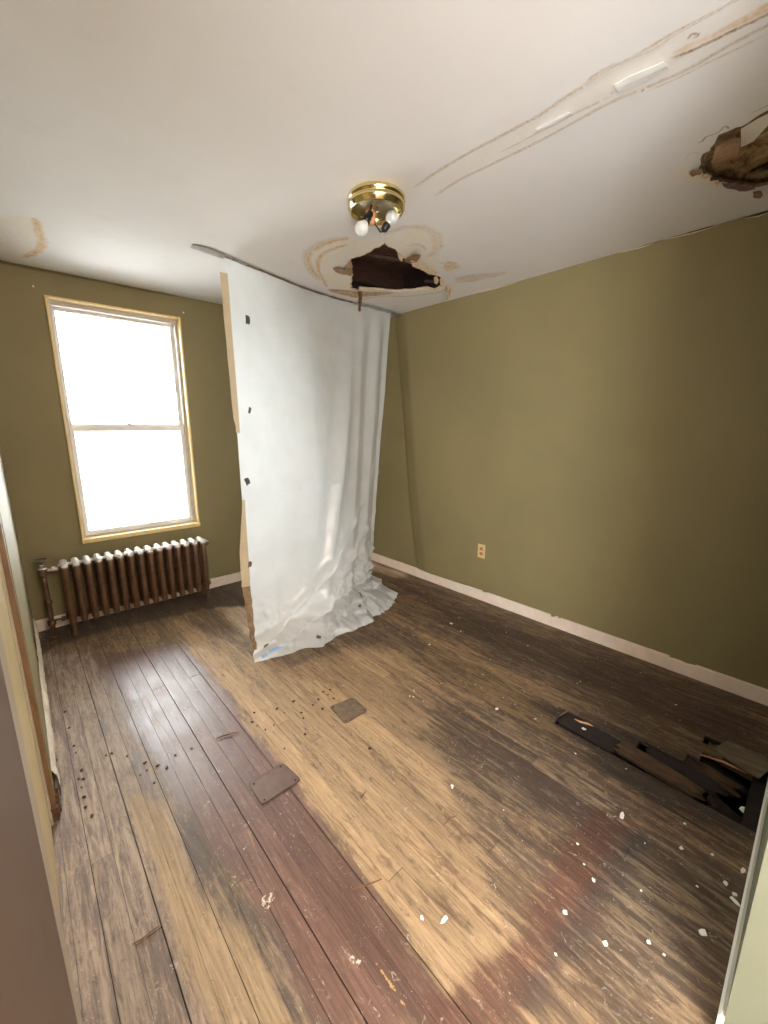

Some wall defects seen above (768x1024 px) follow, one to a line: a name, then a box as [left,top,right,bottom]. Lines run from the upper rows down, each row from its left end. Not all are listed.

crack [410,0,768,202]
spalling [689,111,768,198]
water stain [0,213,51,259]
spalling [333,242,451,312]
water stain [299,224,510,300]